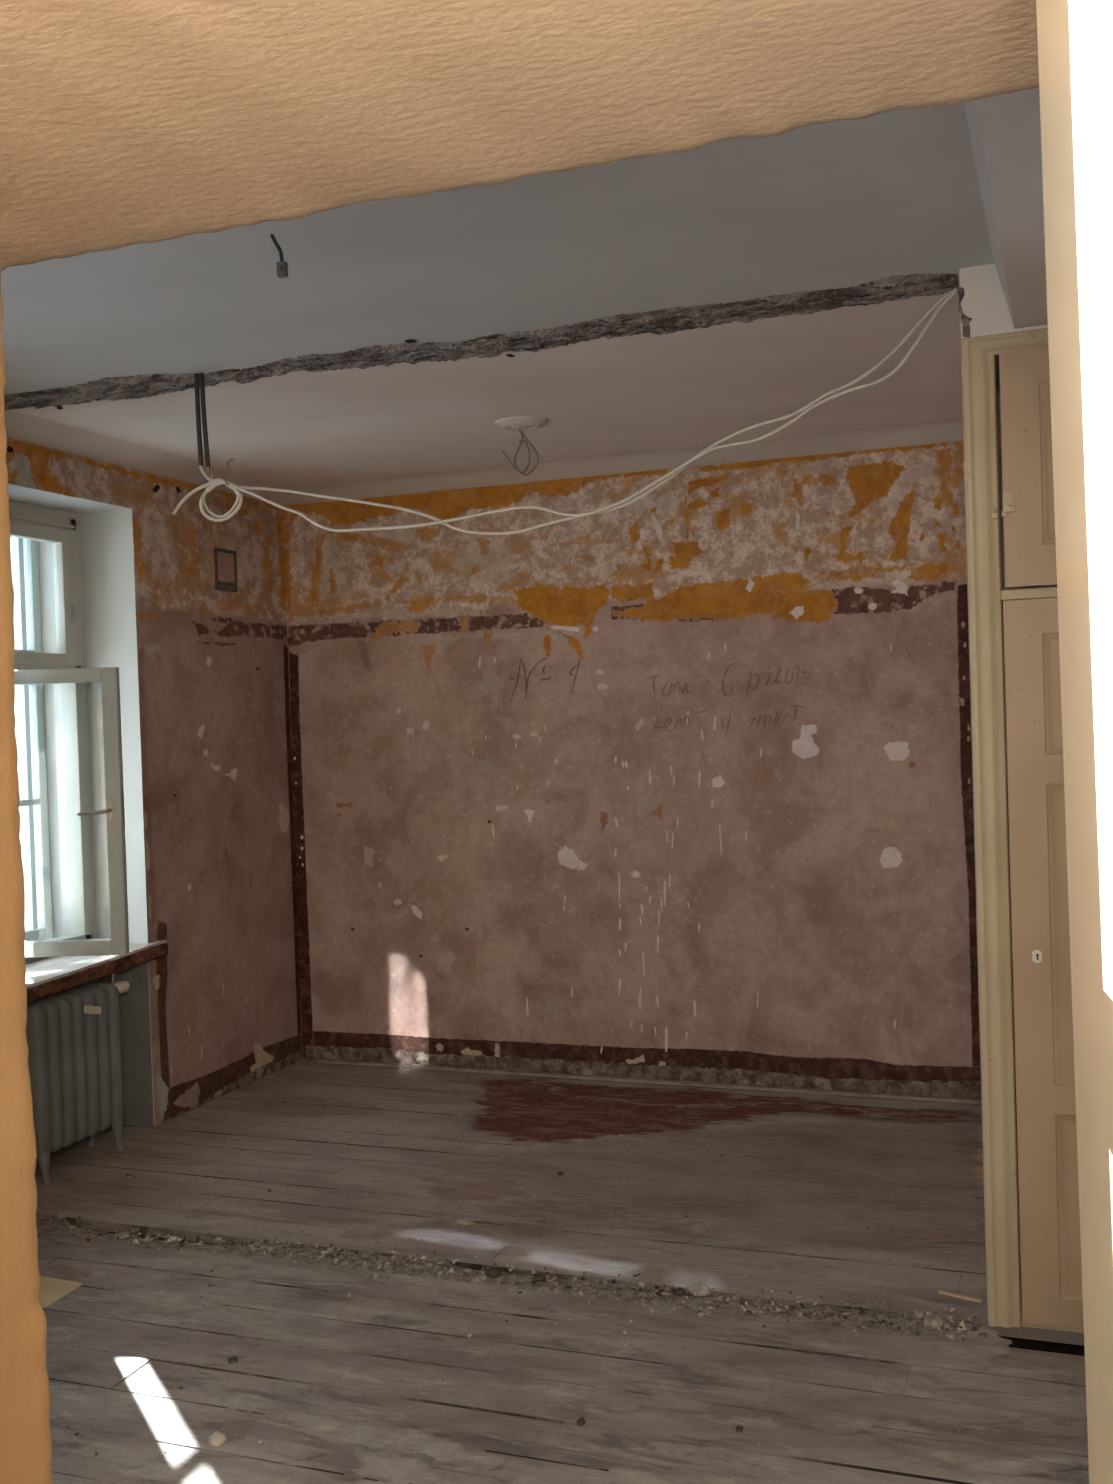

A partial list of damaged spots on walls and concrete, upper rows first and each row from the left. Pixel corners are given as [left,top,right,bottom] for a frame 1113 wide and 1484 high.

spalling [4,274,972,411]
peeling [6,438,964,672]